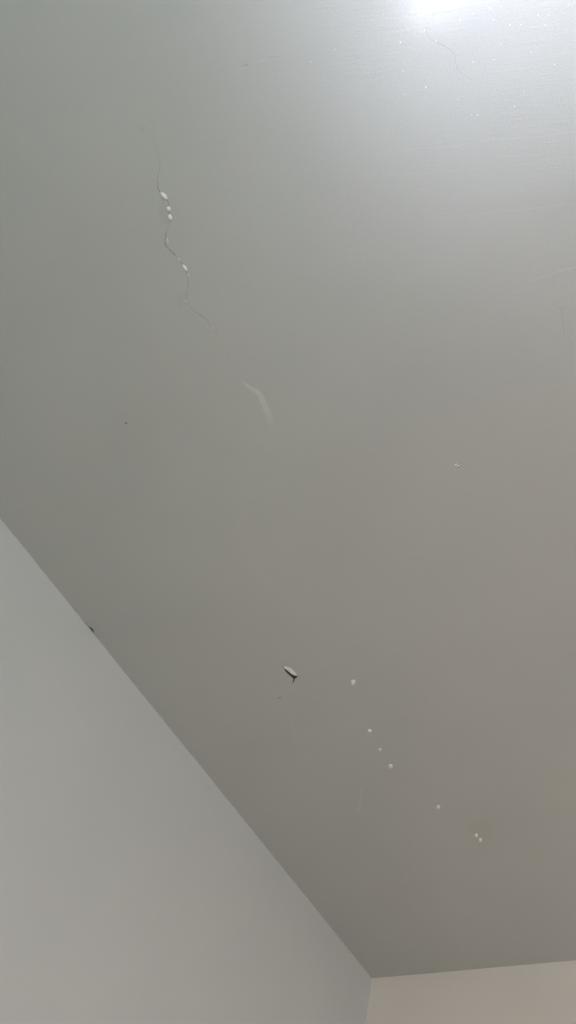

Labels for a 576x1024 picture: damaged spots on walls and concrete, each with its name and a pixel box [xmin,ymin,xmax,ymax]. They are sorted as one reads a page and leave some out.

crack [141,86,241,380]